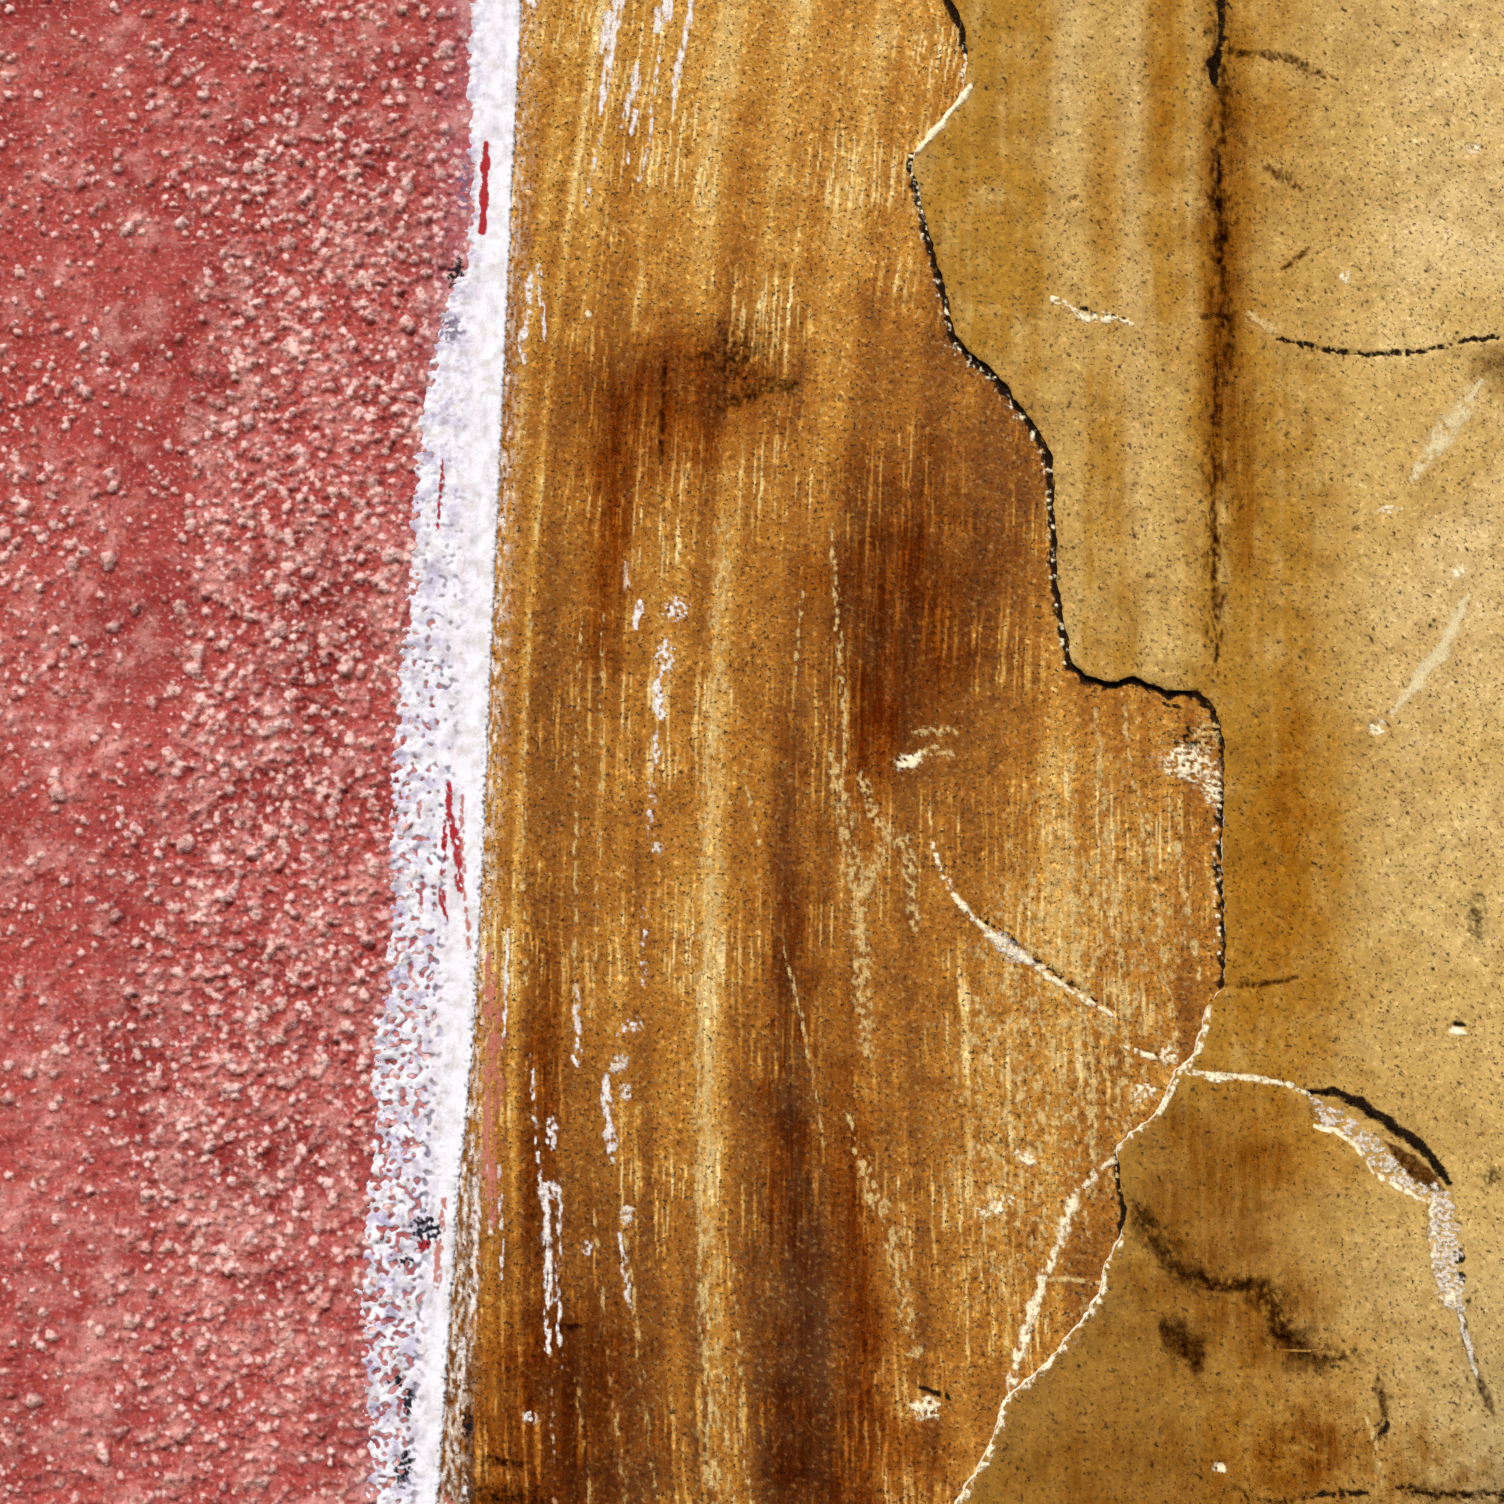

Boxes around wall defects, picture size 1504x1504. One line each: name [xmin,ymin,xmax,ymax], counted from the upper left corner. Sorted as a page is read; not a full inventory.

water stain [659,367,667,465]
water stain [704,332,798,405]
crack [1248,311,1500,358]
spalling [897,727,958,771]
crack [906,0,1326,1503]
spalling [1164,715,1222,803]
spalling [950,692,1201,1303]
spalling [1306,1086,1492,1408]
spalling [910,1385,951,1421]
crack [1244,1376,1504,1504]